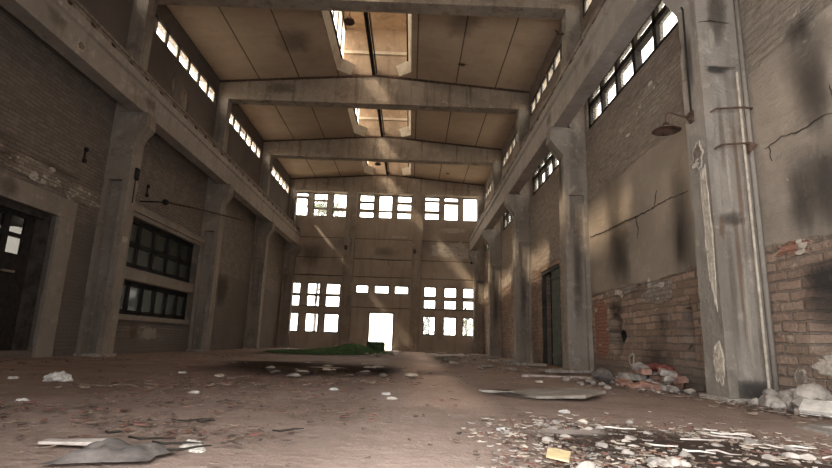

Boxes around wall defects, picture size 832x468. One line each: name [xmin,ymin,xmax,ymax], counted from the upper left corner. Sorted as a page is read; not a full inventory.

crack [765,85,832,161]
flaking render [0,142,65,189]
crack [591,190,688,237]
flaking render [592,294,611,362]
flaking render [794,354,832,388]